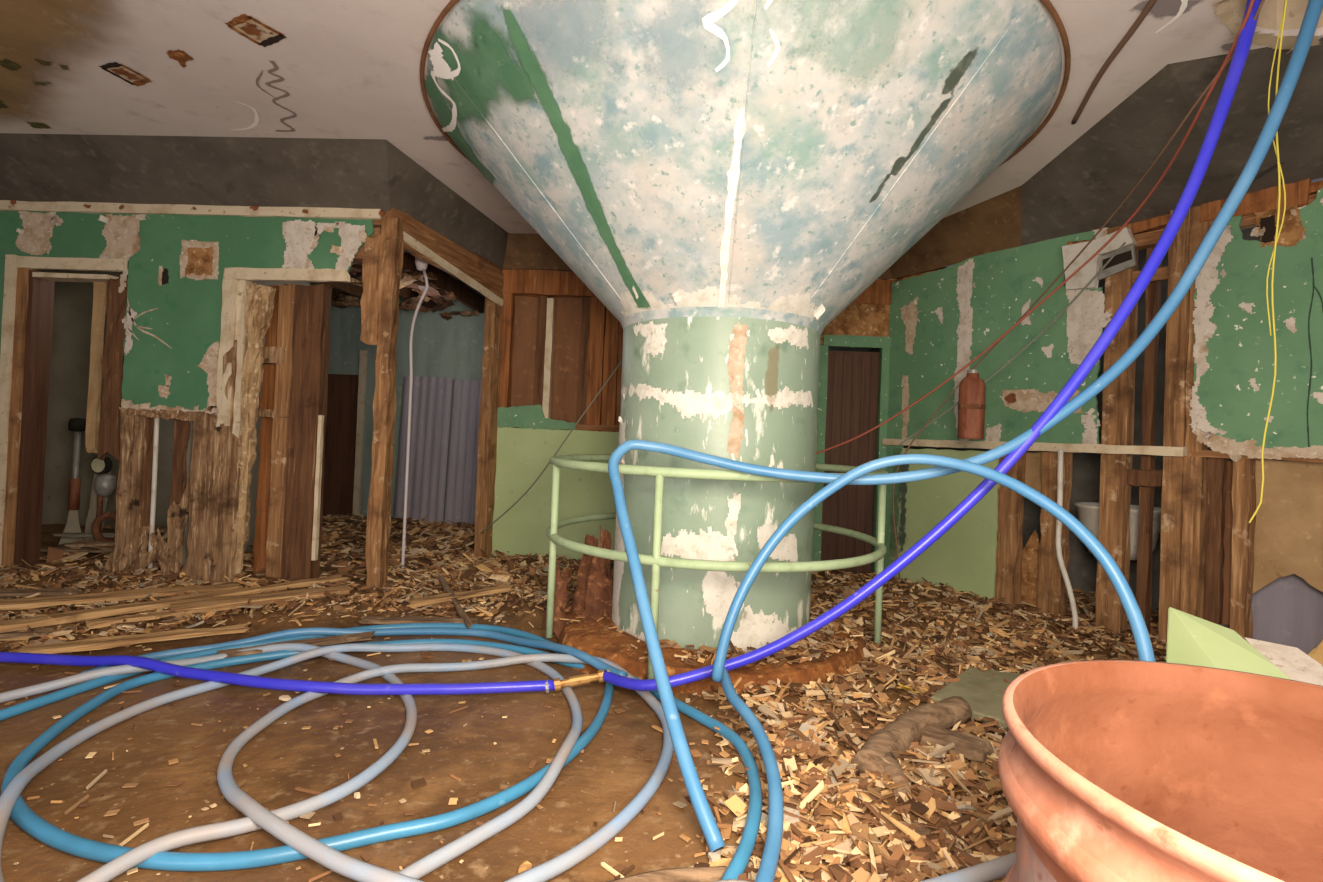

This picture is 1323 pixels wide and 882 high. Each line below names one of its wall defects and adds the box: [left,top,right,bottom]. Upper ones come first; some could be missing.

leakage [0,0,106,129]
peeling [15,211,64,255]
peeling [98,214,146,355]
peeling [282,219,367,270]
peeling [619,286,825,460]
peeling [900,258,1002,441]
peeling [1002,388,1101,444]
peeling [1042,289,1113,365]
peeling [1189,225,1233,439]
spalling [1250,215,1276,243]
peeling [612,513,645,641]
peeling [661,492,798,653]